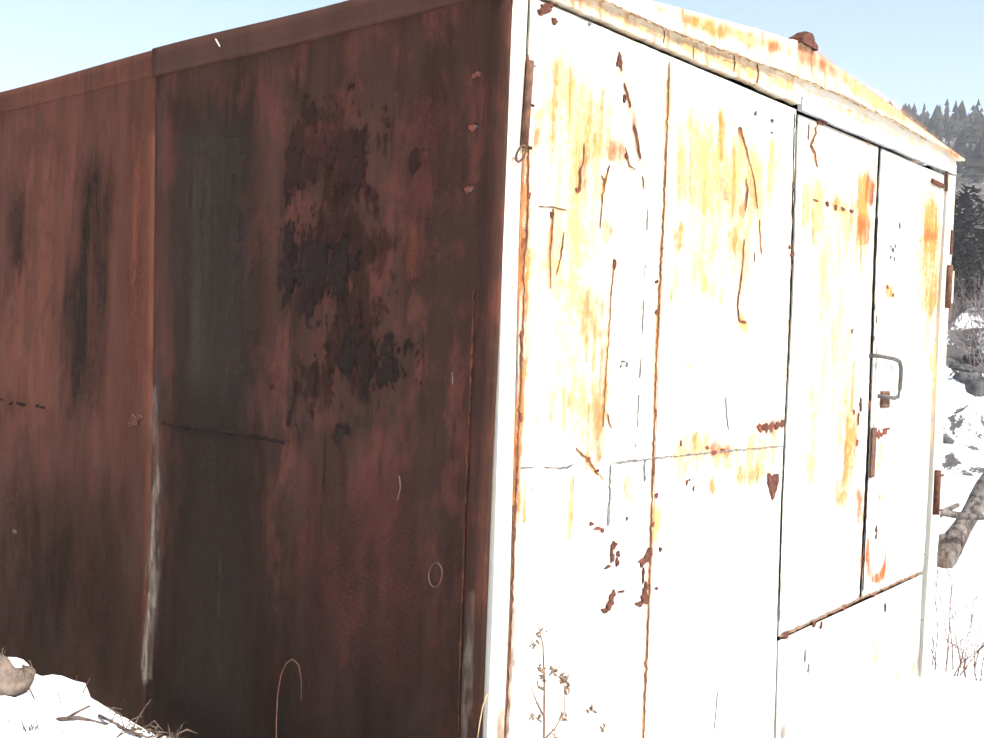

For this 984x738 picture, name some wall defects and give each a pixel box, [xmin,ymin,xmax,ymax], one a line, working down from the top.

corrosion [685,18,754,46]
corrosion [769,41,905,118]
corrosion [518,56,624,470]
corrosion [674,222,684,252]
corrosion [678,110,774,303]
corrosion [804,167,877,522]
corrosion [920,200,940,394]
corrosion [512,356,529,522]
corrosion [674,431,779,548]
corrosion [860,538,886,583]